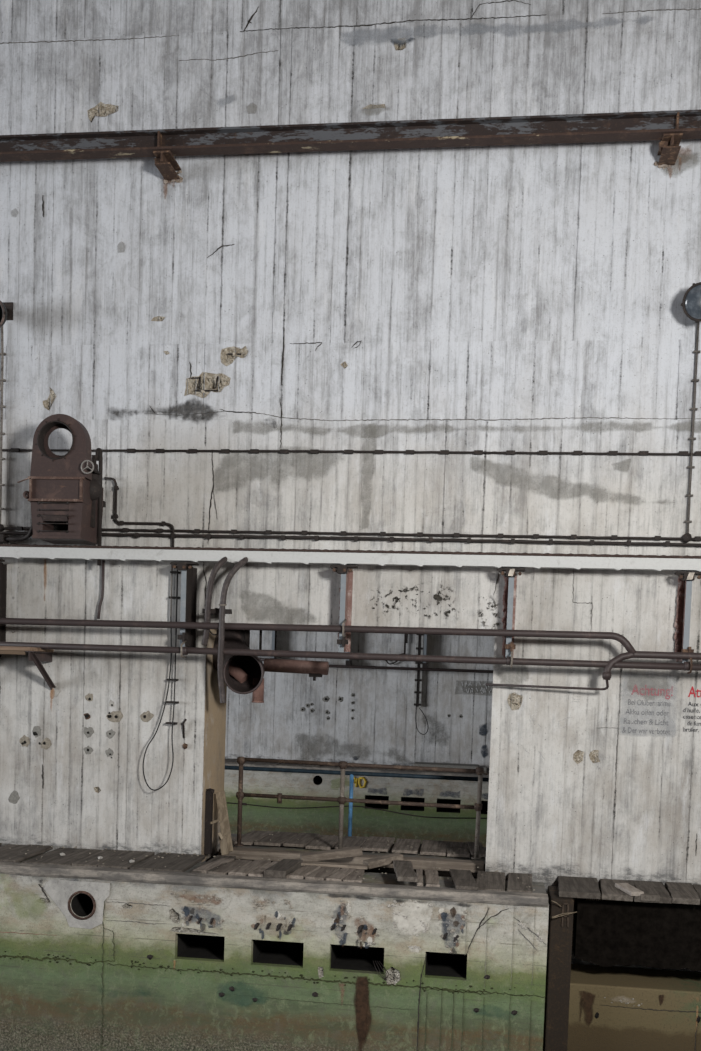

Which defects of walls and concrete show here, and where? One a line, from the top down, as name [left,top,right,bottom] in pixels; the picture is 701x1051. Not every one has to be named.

crack [602,7,701,15]
spalling [88,102,118,122]
spalling [184,346,248,398]
peeling [169,890,225,935]
peeling [251,898,296,939]
peeling [330,900,379,948]
crack [101,901,166,1048]
crack [234,954,484,1051]
rust [354,977,371,1051]
crack [465,908,546,1051]